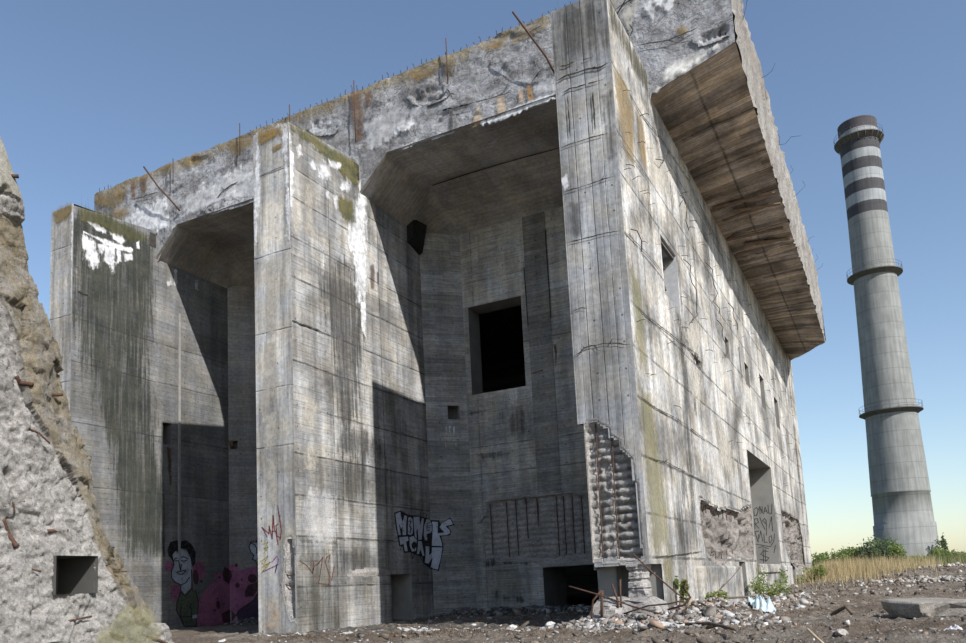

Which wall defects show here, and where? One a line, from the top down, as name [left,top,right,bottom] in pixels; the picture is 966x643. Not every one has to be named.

rust [351,91,371,140]
crack [437,57,740,278]
leakage [563,0,674,90]
spalling [0,186,174,643]
leakage [70,195,177,556]
leakage [277,124,382,501]
spalling [475,418,700,620]
spalling [700,495,754,566]
spalling [781,509,806,572]